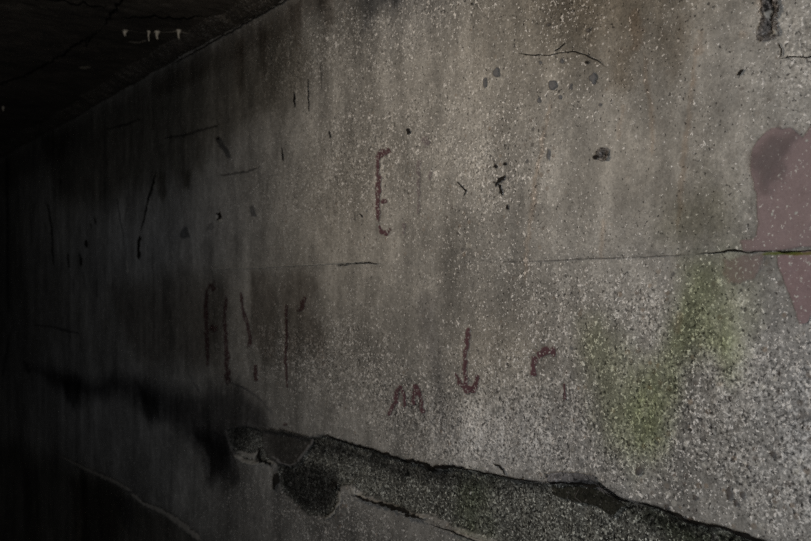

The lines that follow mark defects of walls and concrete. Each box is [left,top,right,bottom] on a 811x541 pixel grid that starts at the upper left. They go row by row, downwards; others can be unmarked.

water stain [122,29,188,43]
spalling [756,0,780,42]
spalling [227,427,752,541]